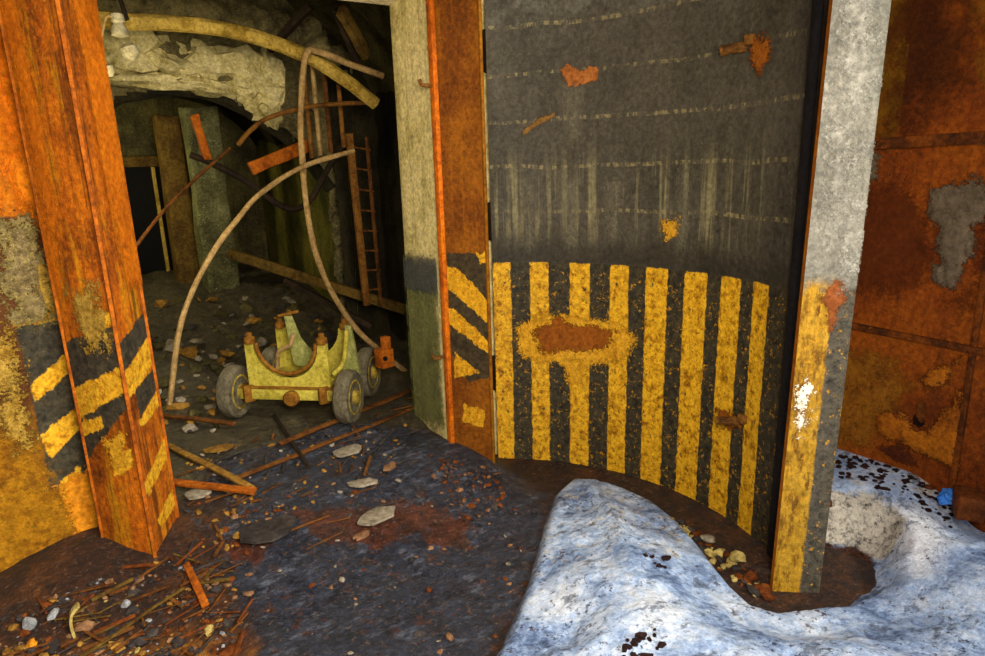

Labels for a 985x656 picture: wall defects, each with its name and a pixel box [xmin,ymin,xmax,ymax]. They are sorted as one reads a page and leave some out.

corrosion [560,64,599,87]
corrosion [748,30,774,77]
corrosion [0,0,63,296]
corrosion [70,0,143,291]
peeling [925,171,985,293]
peeling [0,156,114,464]
corrosion [510,310,638,388]
corrosion [820,279,850,332]
corrosion [837,349,921,448]
peeling [101,430,133,472]
peeling [52,465,99,535]